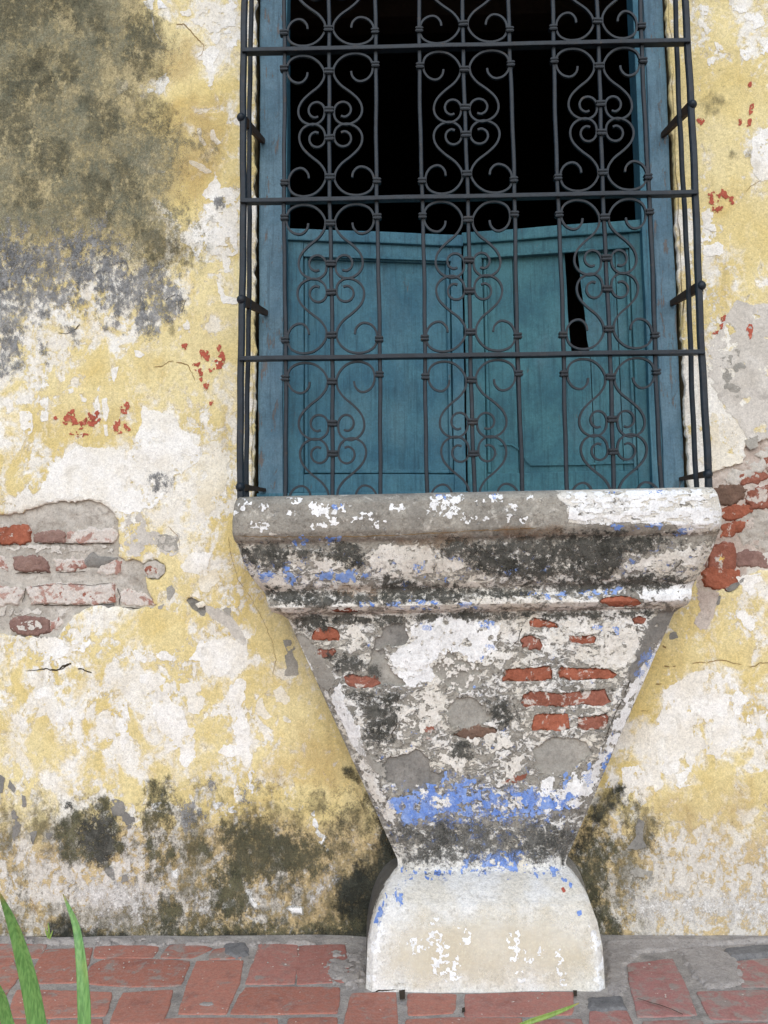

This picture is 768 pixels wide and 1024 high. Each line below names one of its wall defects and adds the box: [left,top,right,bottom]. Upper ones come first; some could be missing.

damp [0,0,218,381]
damp [237,539,368,572]
peeling [0,300,768,852]
damp [265,527,689,633]
crack [28,663,92,673]
damp [324,651,406,749]
damp [342,767,359,783]
flaking render [104,863,128,889]
damp [0,777,768,937]
peeling [401,850,572,892]